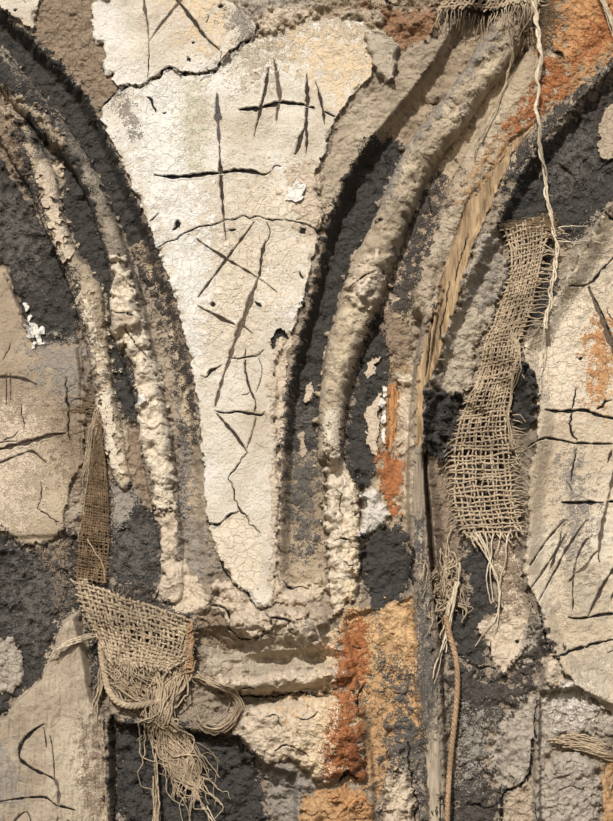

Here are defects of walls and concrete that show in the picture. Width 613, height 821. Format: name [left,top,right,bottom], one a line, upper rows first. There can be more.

crack [99,37,253,112]
rust [446,0,613,229]
flaking render [597,104,613,160]
crack [159,215,323,247]
crack [569,258,613,287]
rust [569,308,613,438]
crack [566,389,577,490]
rust [255,502,383,821]
crack [528,600,613,674]